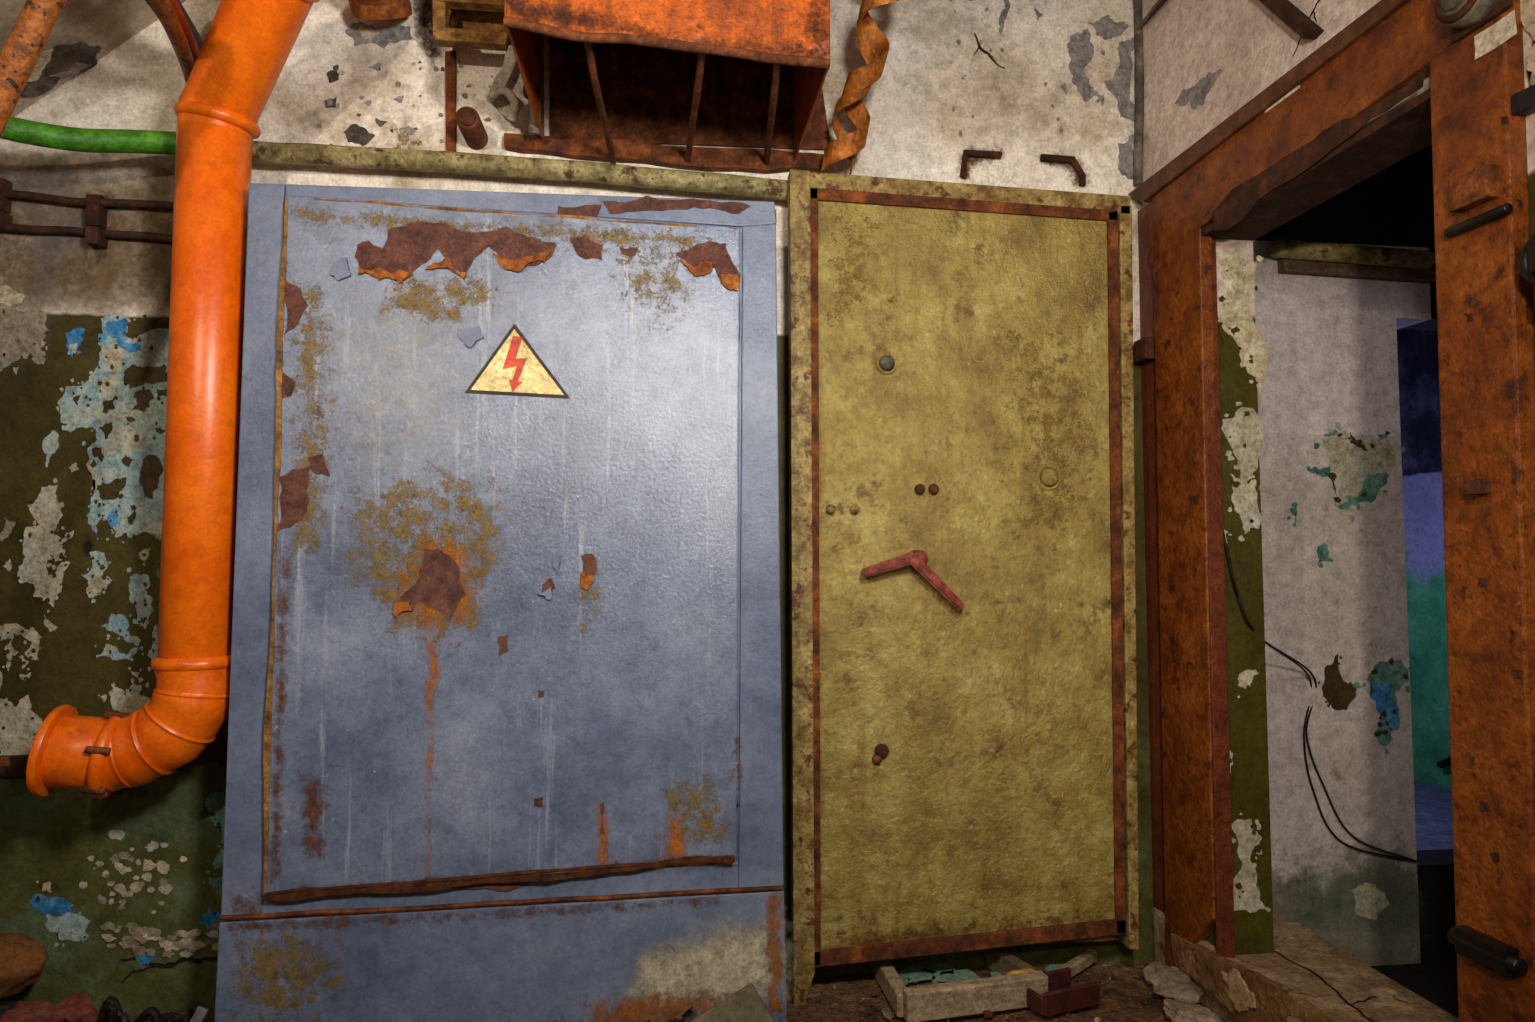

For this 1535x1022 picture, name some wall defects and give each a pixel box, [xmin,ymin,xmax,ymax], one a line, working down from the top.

flaking render [1044,15,1135,180]
peeling [1216,249,1271,542]
peeling [0,300,169,756]
peeling [1287,502,1298,527]
peeling [1317,543,1333,568]
peeling [1237,669,1259,698]
peeling [1318,654,1410,754]
flaking render [30,784,226,965]
peeling [1232,813,1315,944]
spalling [1369,988,1399,1008]